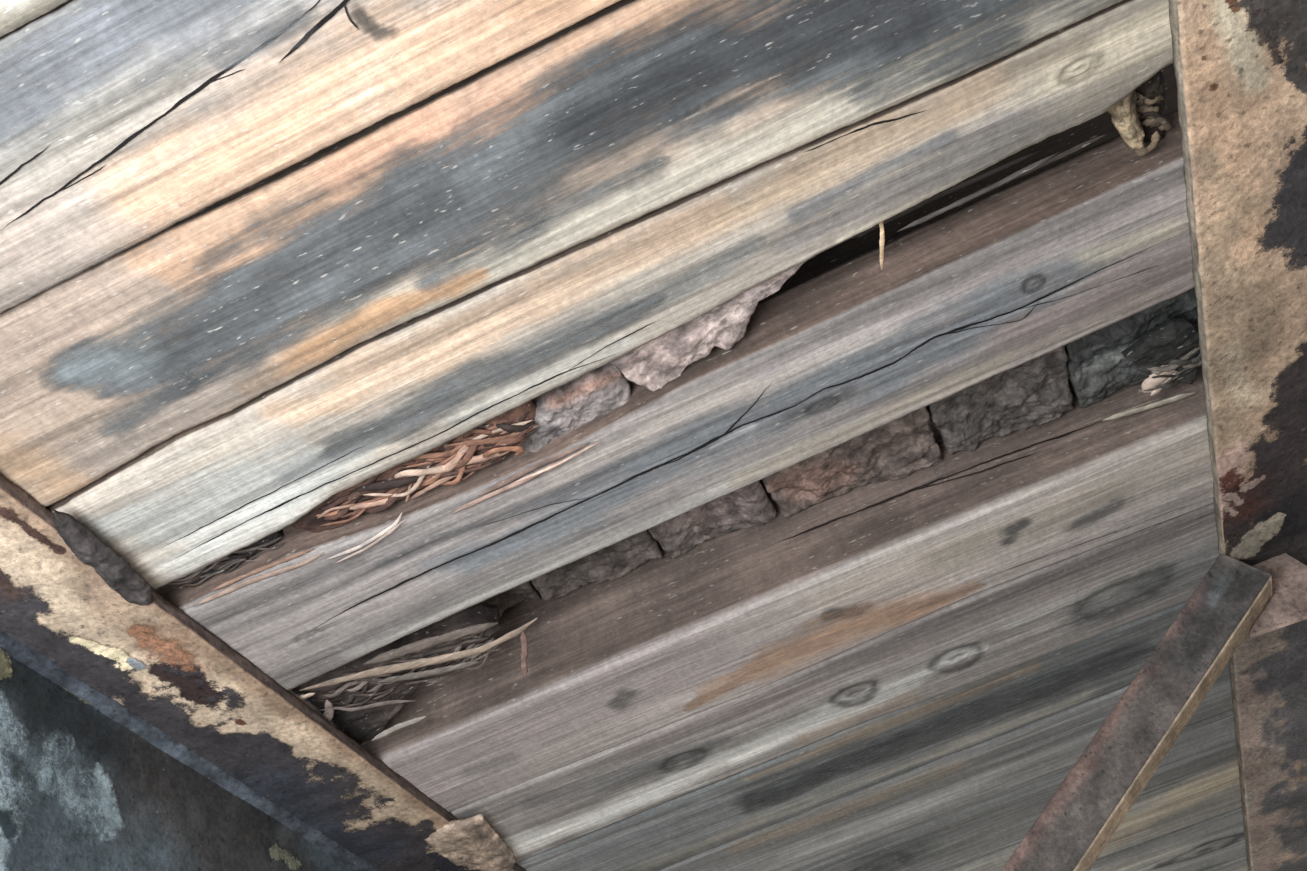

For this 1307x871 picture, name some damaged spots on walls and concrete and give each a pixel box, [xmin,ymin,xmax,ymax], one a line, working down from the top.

leakage [0,0,255,144]
crack [0,0,359,231]
leakage [44,0,1098,456]
corrosion [0,507,66,555]
crack [303,236,1176,635]
peeling [1222,475,1266,517]
peeling [1229,512,1286,560]
corrosion [1219,342,1307,566]
peeling [0,648,13,680]
leakage [0,695,121,871]
peeling [69,637,146,671]
corrosion [0,571,481,871]